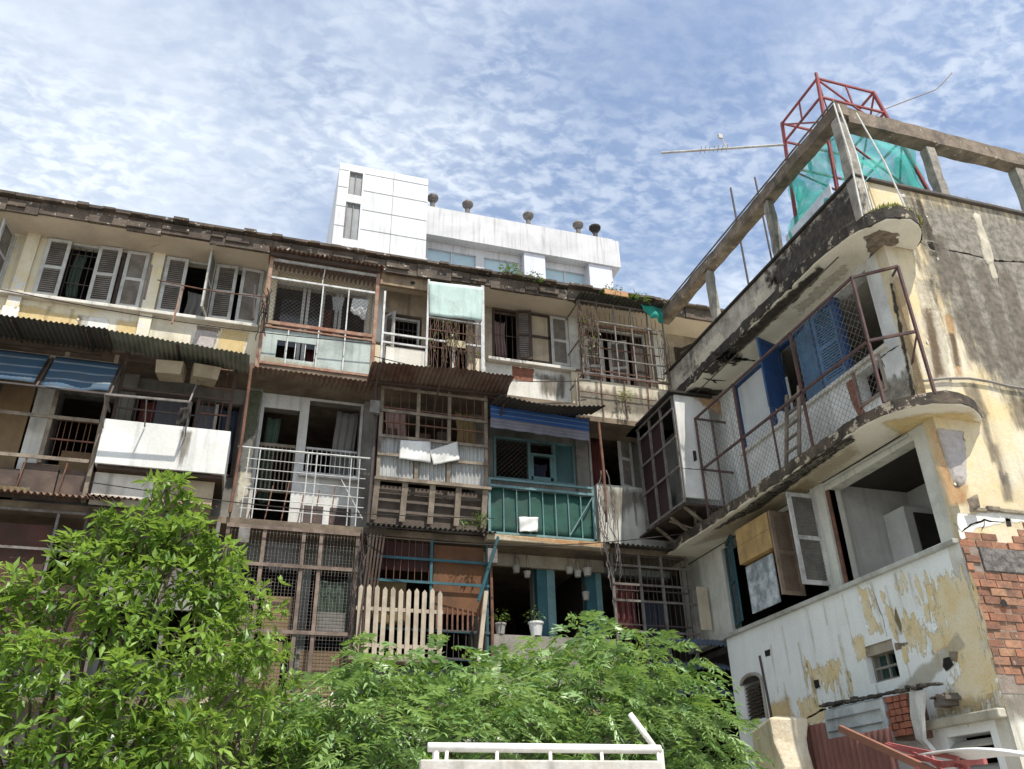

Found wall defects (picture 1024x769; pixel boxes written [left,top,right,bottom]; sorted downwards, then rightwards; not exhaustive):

water stain [702,181,869,375]
spalling [863,230,900,258]
water stain [904,192,1024,427]
crack [925,244,1022,283]
flaking render [936,428,967,488]
flaking render [797,495,1024,726]